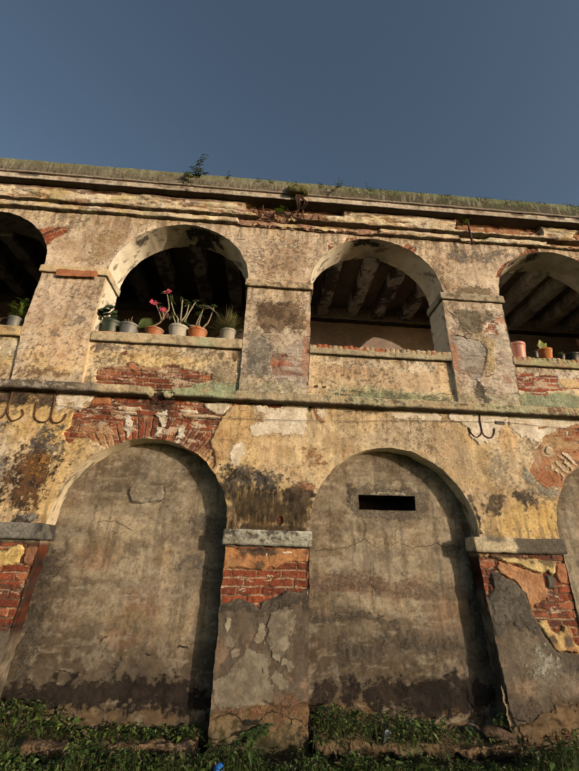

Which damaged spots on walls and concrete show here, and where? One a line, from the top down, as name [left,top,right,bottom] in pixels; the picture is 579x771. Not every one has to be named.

peeling [95,351,212,390]
peeling [270,336,310,388]
peeling [448,315,579,396]
damp [27,422,65,462]
peeling [55,393,326,468]
peeling [389,410,579,489]
damp [189,463,316,534]
peeling [0,542,39,631]
peeling [221,546,310,608]
peeling [478,553,579,681]
peeling [211,607,296,710]
crack [212,709,300,726]